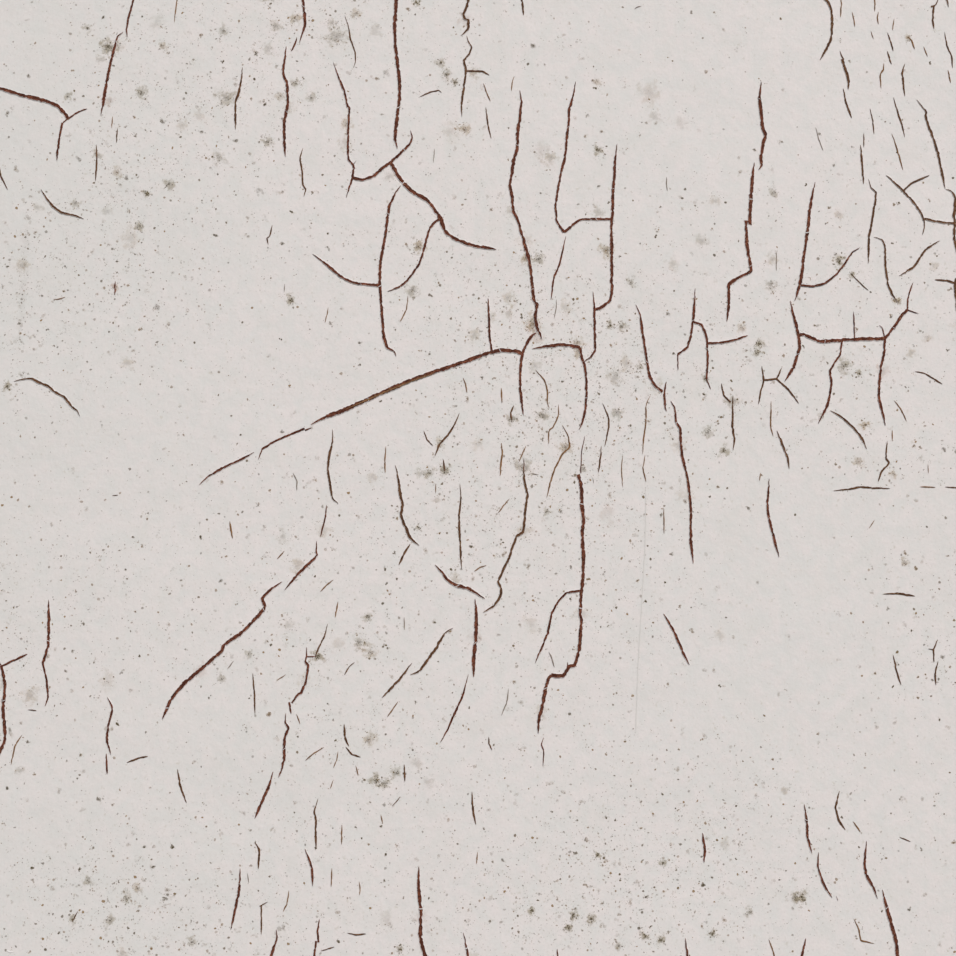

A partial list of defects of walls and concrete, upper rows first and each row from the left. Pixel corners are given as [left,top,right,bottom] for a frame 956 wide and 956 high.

crack [0,0,135,181]
crack [41,189,84,219]
crack [758,0,956,557]
crack [14,377,80,416]
crack [162,0,767,763]
crack [0,600,51,764]
crack [254,580,360,886]
crack [230,843,289,956]
crack [313,919,365,956]
crack [416,867,428,956]
crack [804,804,838,900]
crack [835,791,900,956]